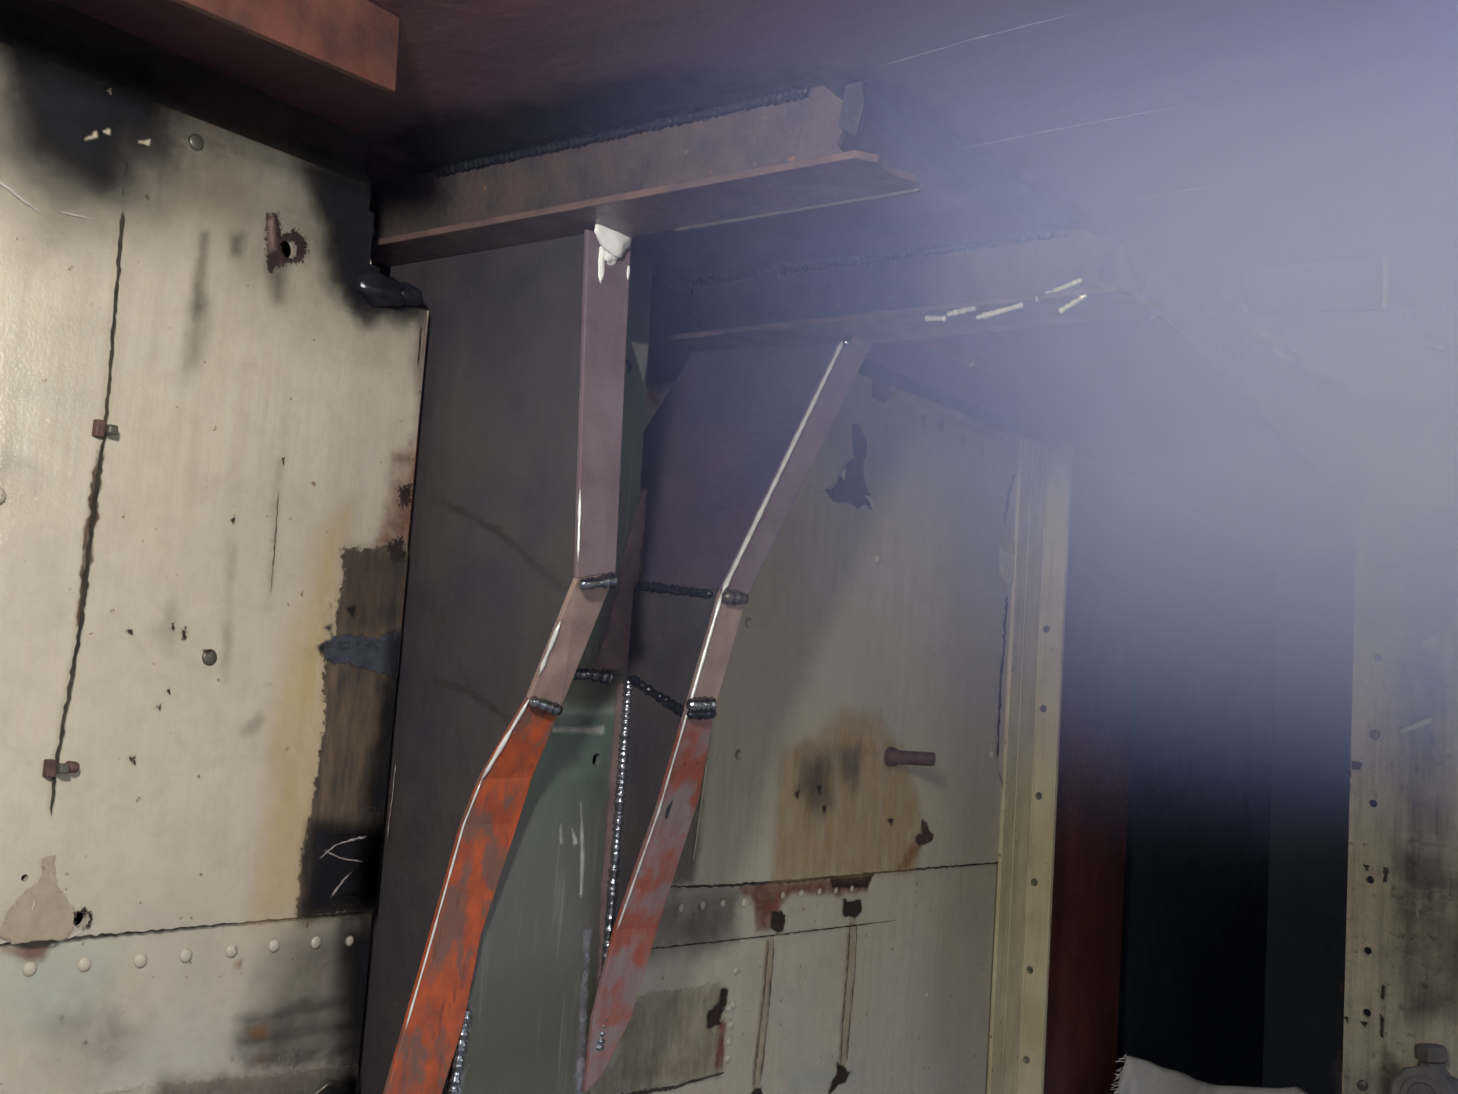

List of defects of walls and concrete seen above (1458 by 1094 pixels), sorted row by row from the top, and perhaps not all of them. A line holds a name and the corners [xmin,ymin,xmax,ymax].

leakage [0,19,164,192]
crack [50,162,127,815]
peeling [817,422,877,513]
peeling [0,855,93,946]
rust [743,874,874,1094]